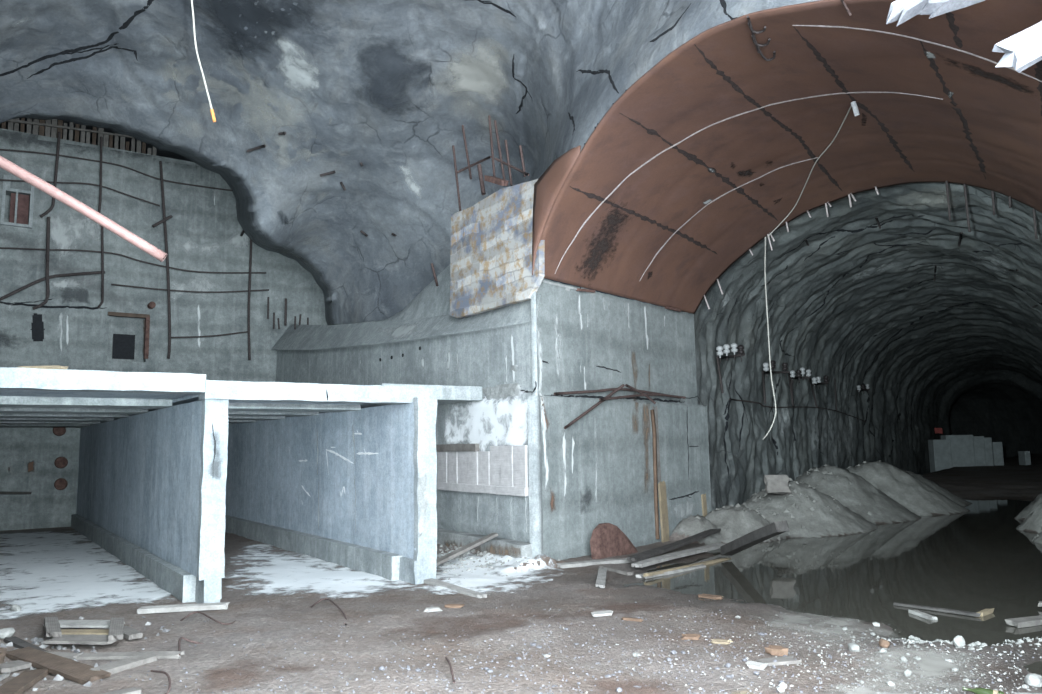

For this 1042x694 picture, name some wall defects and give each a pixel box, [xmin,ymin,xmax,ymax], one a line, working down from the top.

crack [0,0,154,79]
damp [360,43,428,110]
crack [577,69,619,93]